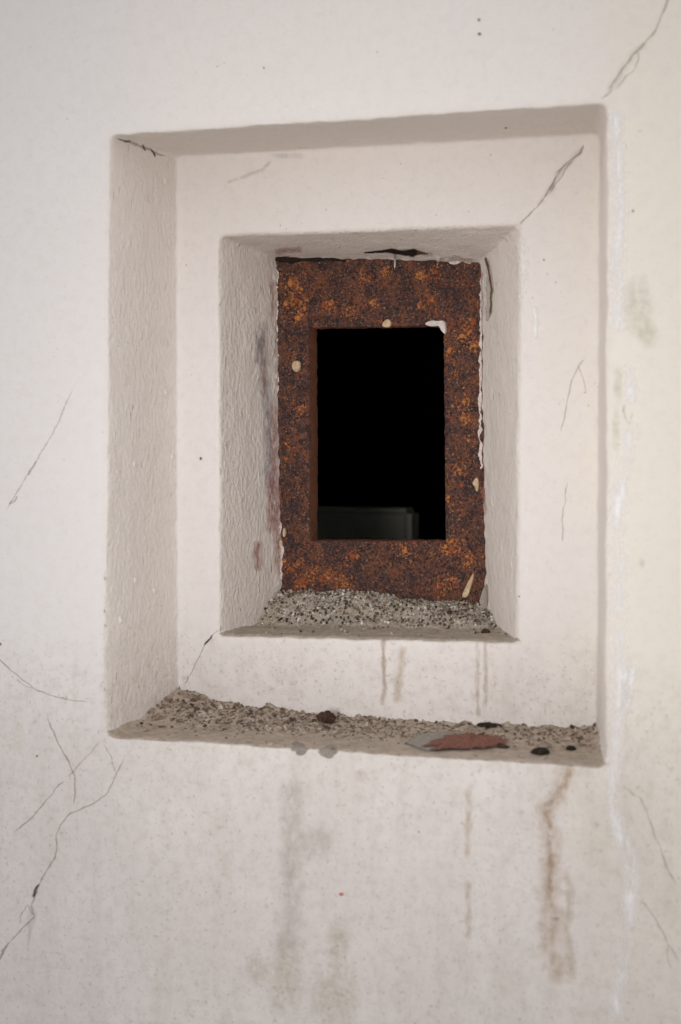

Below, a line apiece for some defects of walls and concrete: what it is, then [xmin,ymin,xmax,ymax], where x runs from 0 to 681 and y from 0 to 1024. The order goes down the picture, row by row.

water stain [608,431,638,929]